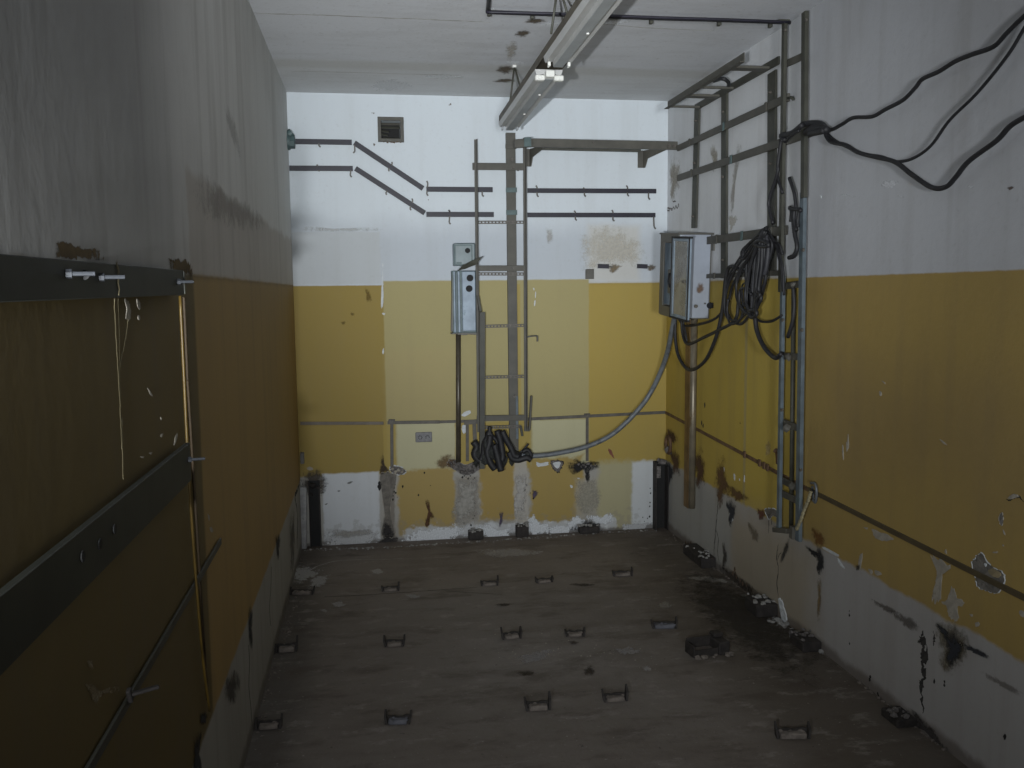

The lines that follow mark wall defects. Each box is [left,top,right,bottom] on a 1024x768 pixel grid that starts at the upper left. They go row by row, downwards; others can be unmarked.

corrosion [695,455,744,506]
damp [527,513,652,534]
peeling [930,549,980,627]
spalling [971,512,1006,594]